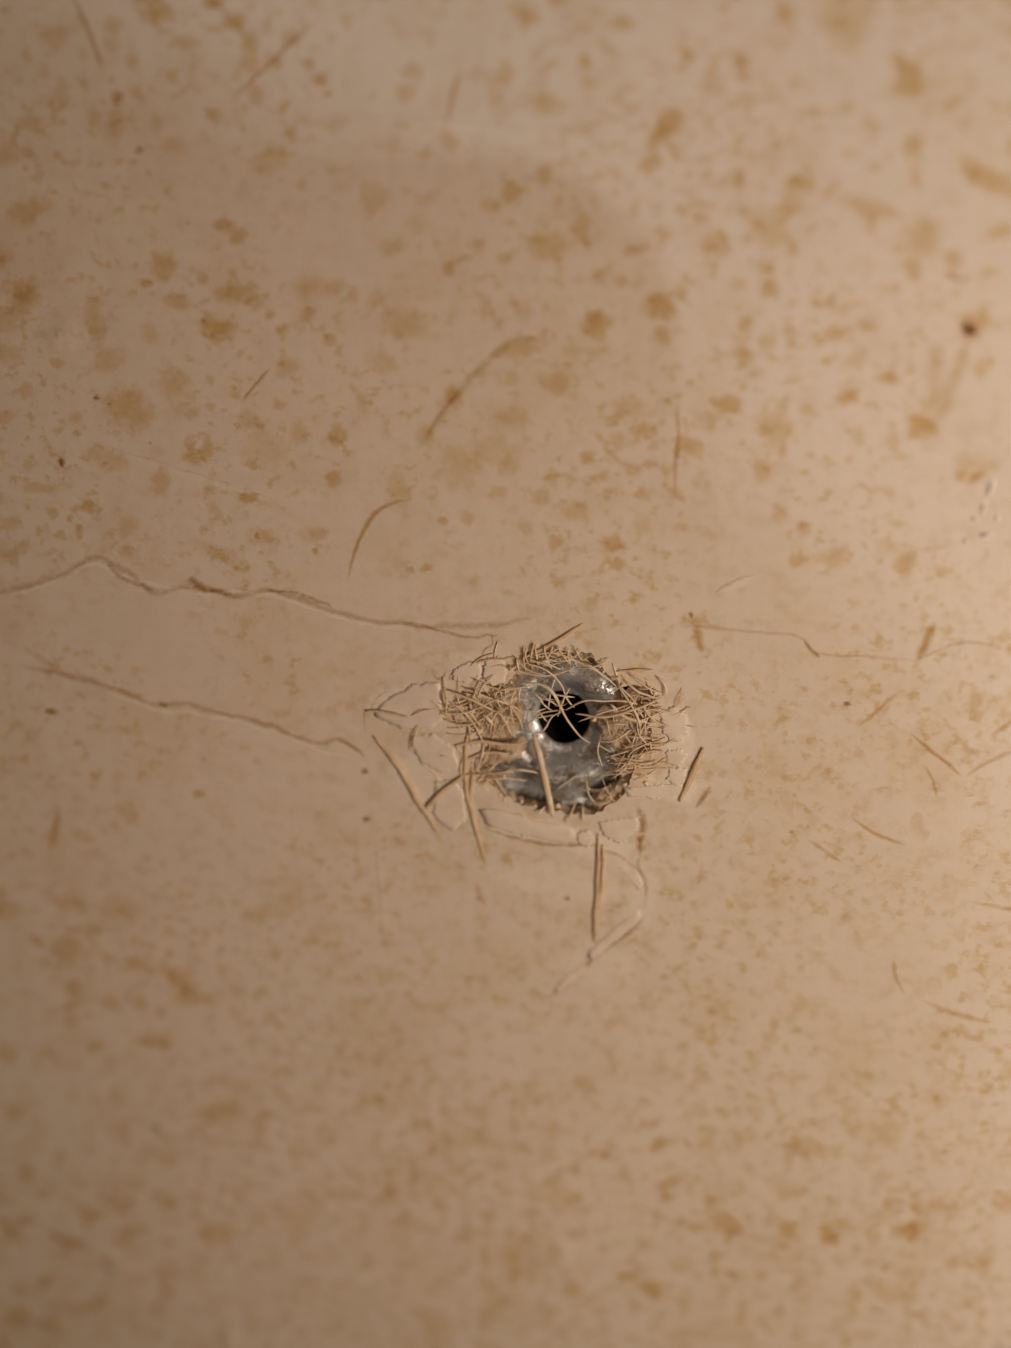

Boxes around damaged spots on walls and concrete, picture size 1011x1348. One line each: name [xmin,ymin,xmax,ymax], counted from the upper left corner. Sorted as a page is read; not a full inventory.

crack [99,687,361,761]